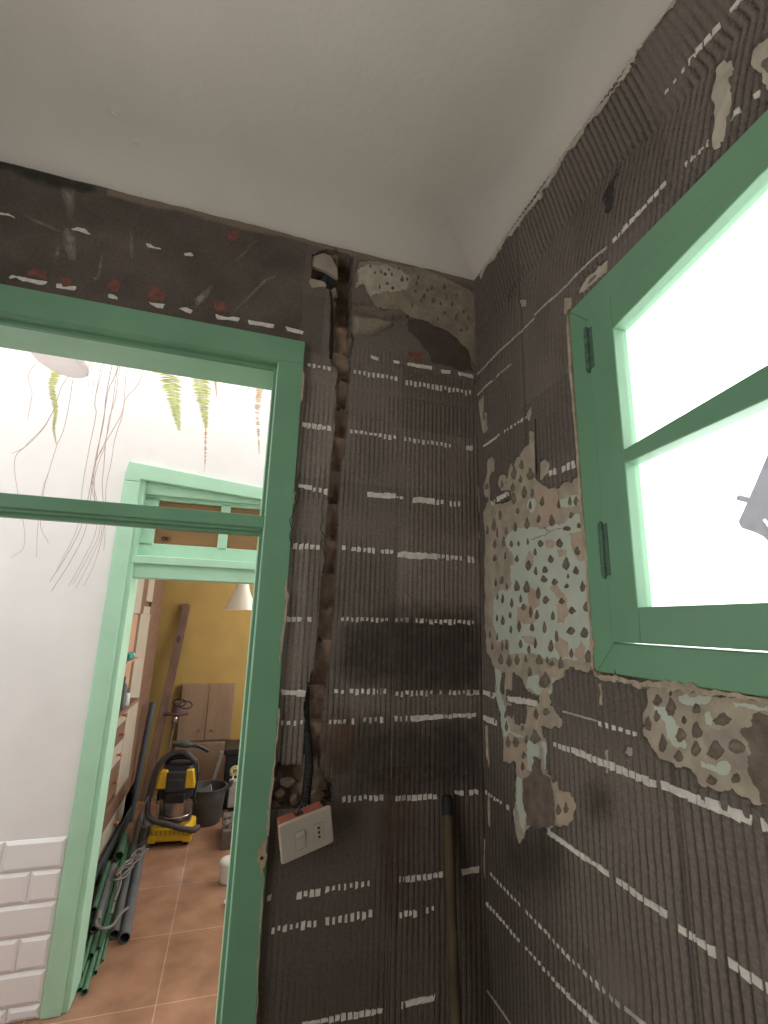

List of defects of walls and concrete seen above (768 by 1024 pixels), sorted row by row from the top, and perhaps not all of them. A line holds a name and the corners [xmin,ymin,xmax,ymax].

peeling [751,38,768,90]
crack [289,472,326,573]
peeling [329,261,768,1024]